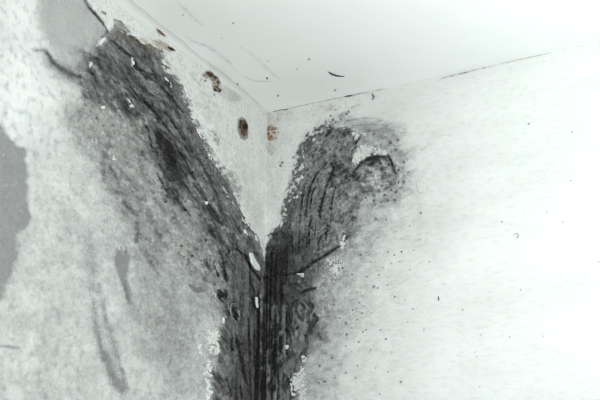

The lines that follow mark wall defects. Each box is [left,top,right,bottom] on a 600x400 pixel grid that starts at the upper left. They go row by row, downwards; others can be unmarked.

rust [201,71,221,95]
rust [238,118,248,140]
damp [41,0,409,400]